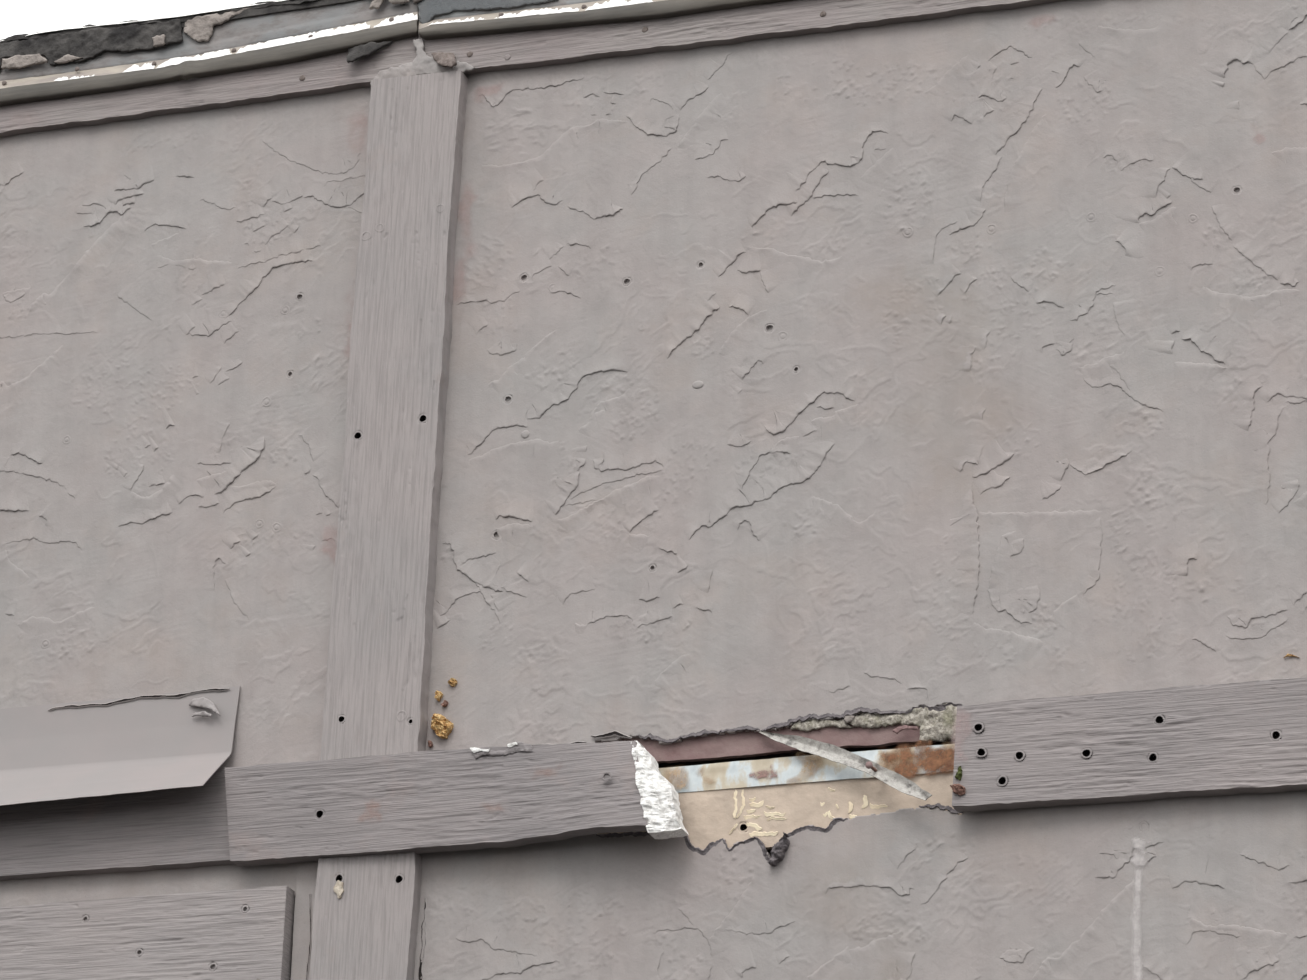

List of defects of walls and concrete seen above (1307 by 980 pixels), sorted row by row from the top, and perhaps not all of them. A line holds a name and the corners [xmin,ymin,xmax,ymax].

crack [75,135,366,344]
crack [457,50,890,358]
crack [914,55,1106,324]
crack [1103,139,1299,287]
crack [1011,269,1307,513]
crack [433,345,860,634]
crack [952,438,1132,499]
corrosion [749,770,777,779]
spalling [684,818,848,867]
spalling [636,702,962,743]
corrosion [881,740,955,778]
spalling [919,803,963,814]